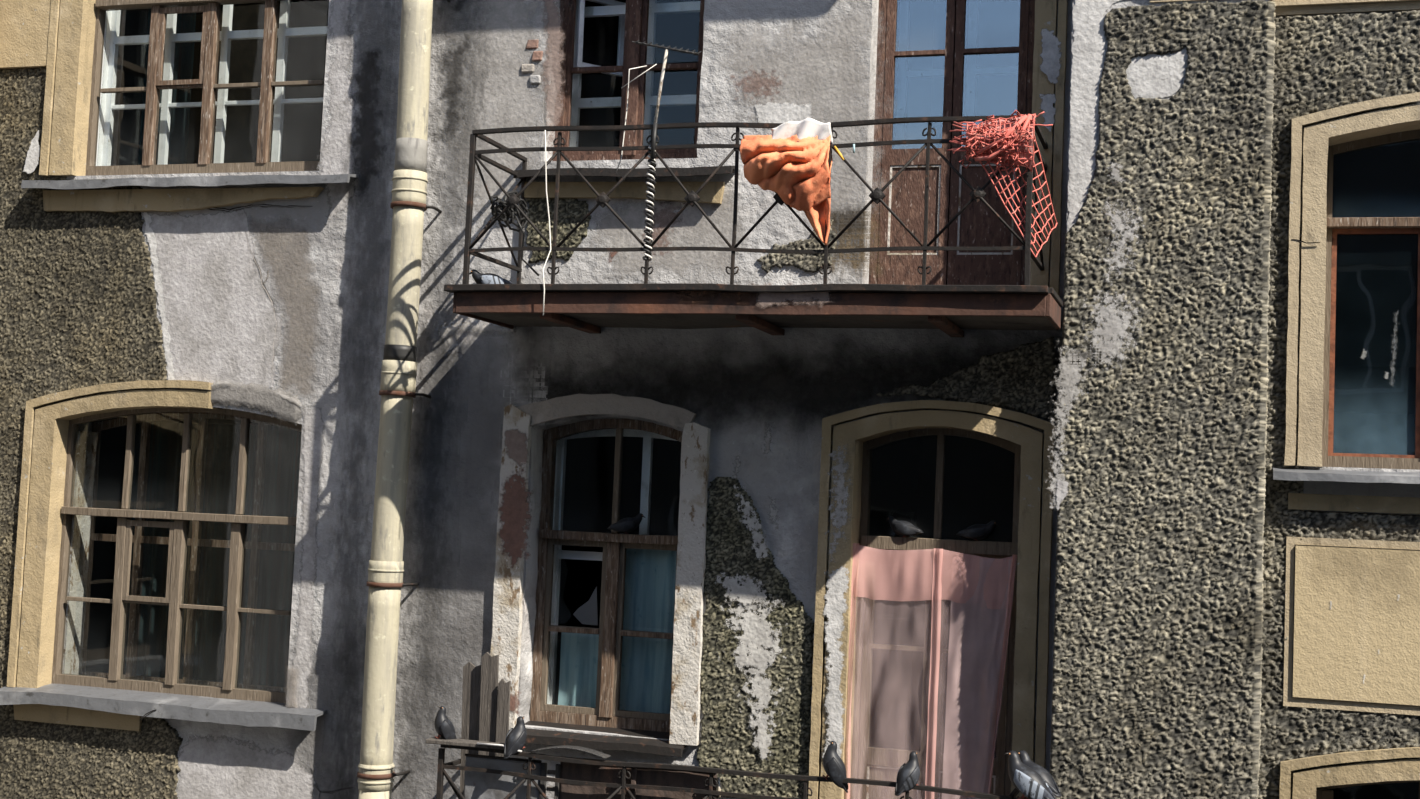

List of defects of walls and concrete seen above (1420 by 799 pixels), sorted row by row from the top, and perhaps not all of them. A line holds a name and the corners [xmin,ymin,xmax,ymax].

peeling [320,0,356,222]
damp [353,51,384,191]
damp [441,42,469,134]
peeling [455,0,565,213]
peeling [1039,0,1130,231]
spalling [1126,49,1188,99]
peeling [142,209,325,708]
spalling [499,429,531,568]
peeling [733,484,768,561]
peeling [715,572,792,760]
peeling [176,735,315,799]
rust [559,756,717,799]